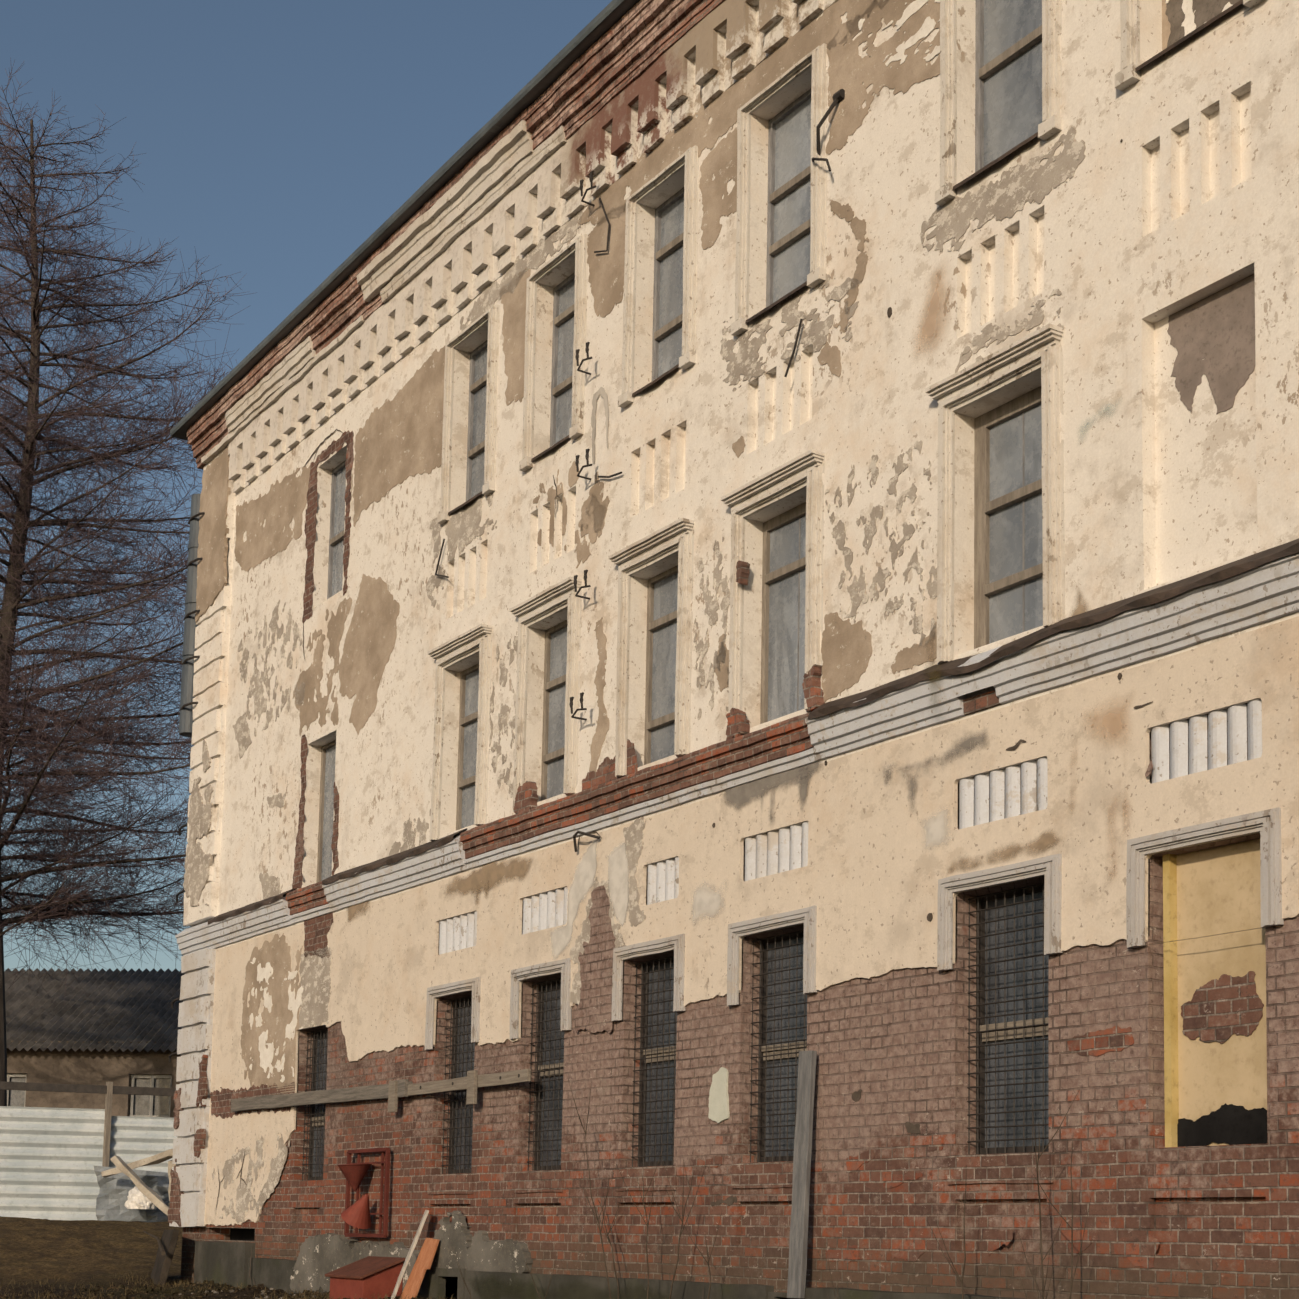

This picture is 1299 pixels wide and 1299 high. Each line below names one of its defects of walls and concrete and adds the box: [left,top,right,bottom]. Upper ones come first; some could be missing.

peeling [1165,0,1240,47]
peeling [460,0,940,406]
peeling [920,126,1086,251]
peeling [1167,274,1255,423]
peeling [195,346,445,900]
peeling [802,440,938,712]
flaking render [569,816,646,1034]
peeling [212,1133,290,1223]
peeling [173,912,333,1158]
peeling [708,1067,730,1123]
spalling [1181,971,1264,1044]
spalling [1177,1103,1268,1147]